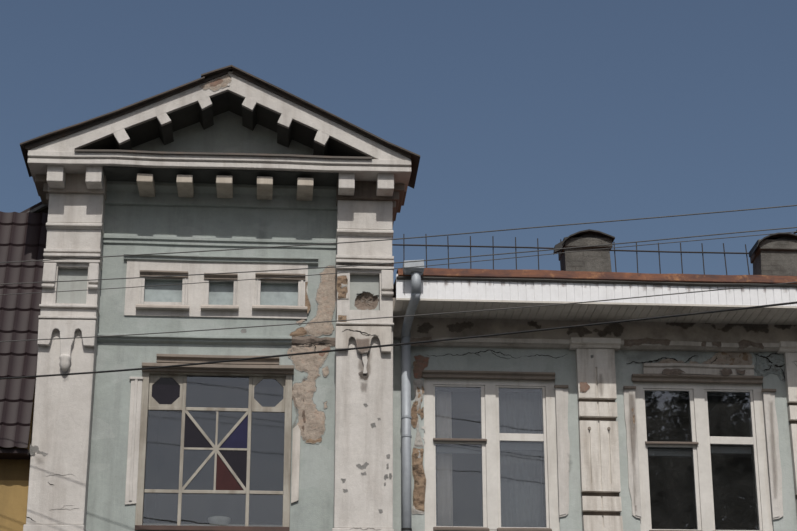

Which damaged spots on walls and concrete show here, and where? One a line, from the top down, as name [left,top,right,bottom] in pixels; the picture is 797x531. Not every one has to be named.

peeling [287,265,379,444]
crack [298,329,377,348]
peeling [567,323,671,347]
peeling [651,322,796,376]
crack [756,353,797,379]
flaking render [411,353,429,514]